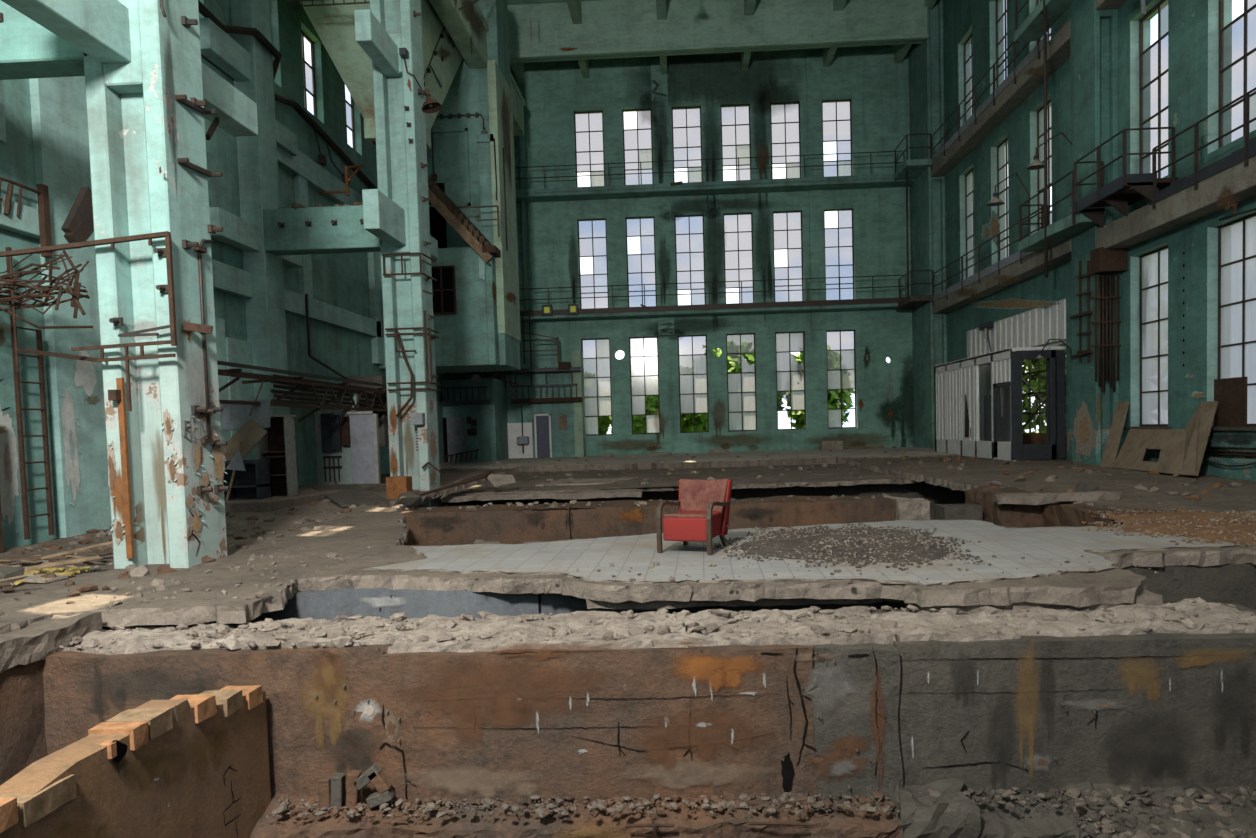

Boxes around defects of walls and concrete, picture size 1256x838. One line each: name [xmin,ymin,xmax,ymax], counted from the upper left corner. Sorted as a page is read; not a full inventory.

peeling [0,406,21,533]
peeling [107,441,116,498]
peeling [161,409,178,484]
peeling [185,414,227,540]
peeling [110,517,125,545]
corrosion [675,656,758,690]
crack [379,648,816,799]
leakage [992,657,1053,796]
crack [223,764,242,837]